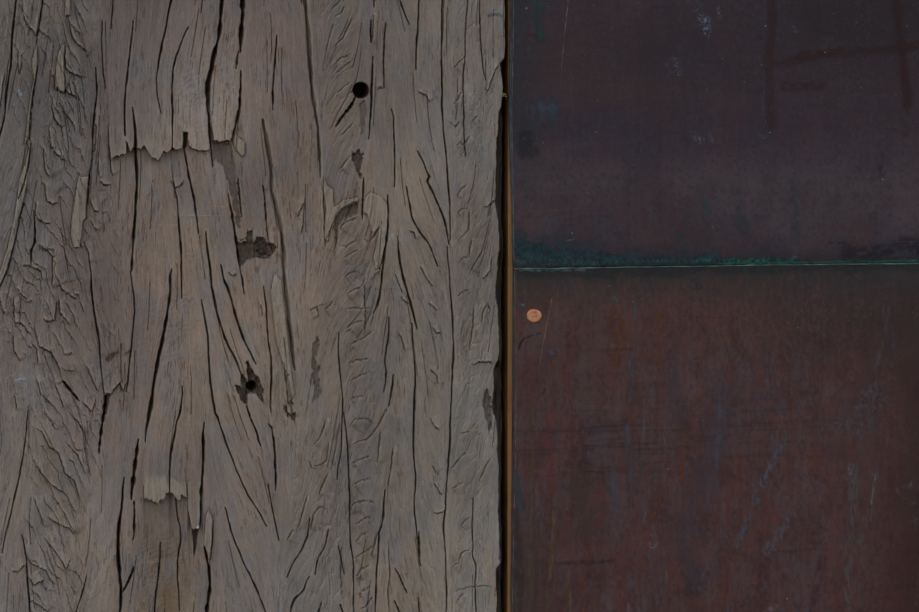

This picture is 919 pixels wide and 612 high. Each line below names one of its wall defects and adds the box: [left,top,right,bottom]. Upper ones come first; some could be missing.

crack [0,0,17,138]
crack [36,0,44,44]
crack [0,66,38,286]
crack [62,380,80,402]
crack [86,0,139,454]
crack [116,0,296,612]
crack [287,0,487,612]
water stain [513,239,919,277]
crack [2,411,31,612]
crack [76,576,87,612]